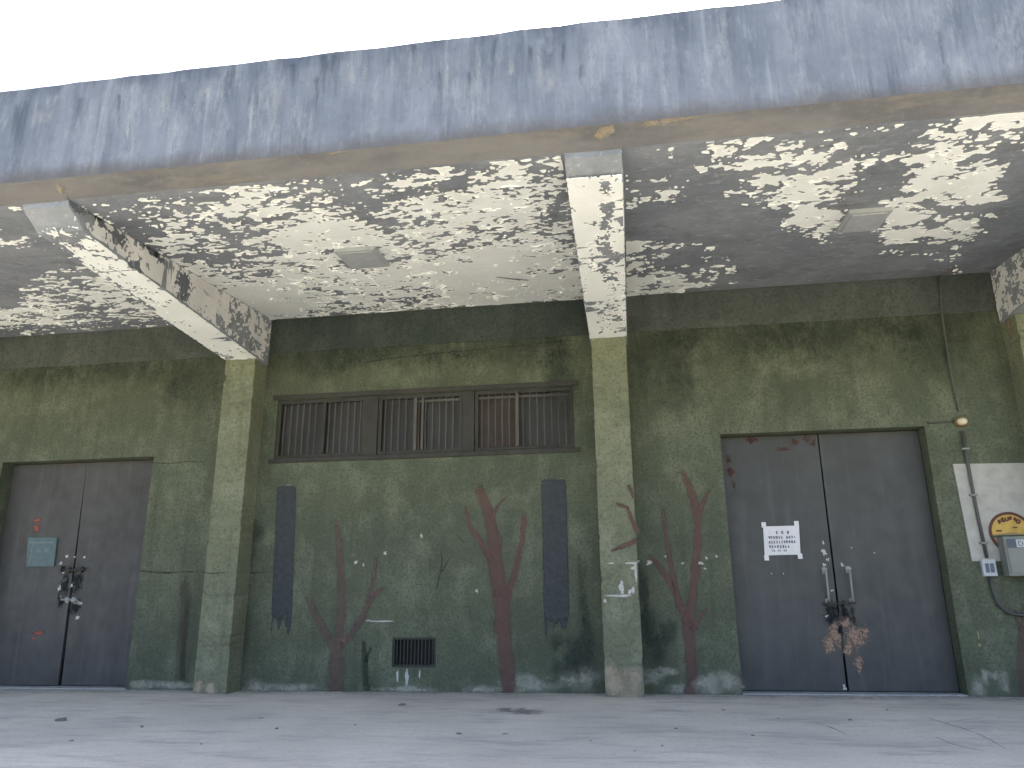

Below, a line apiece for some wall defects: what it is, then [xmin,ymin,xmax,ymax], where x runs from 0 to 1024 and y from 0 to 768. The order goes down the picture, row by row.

peeling [0,112,1024,360]
crack [140,568,225,576]
rust [821,616,869,673]